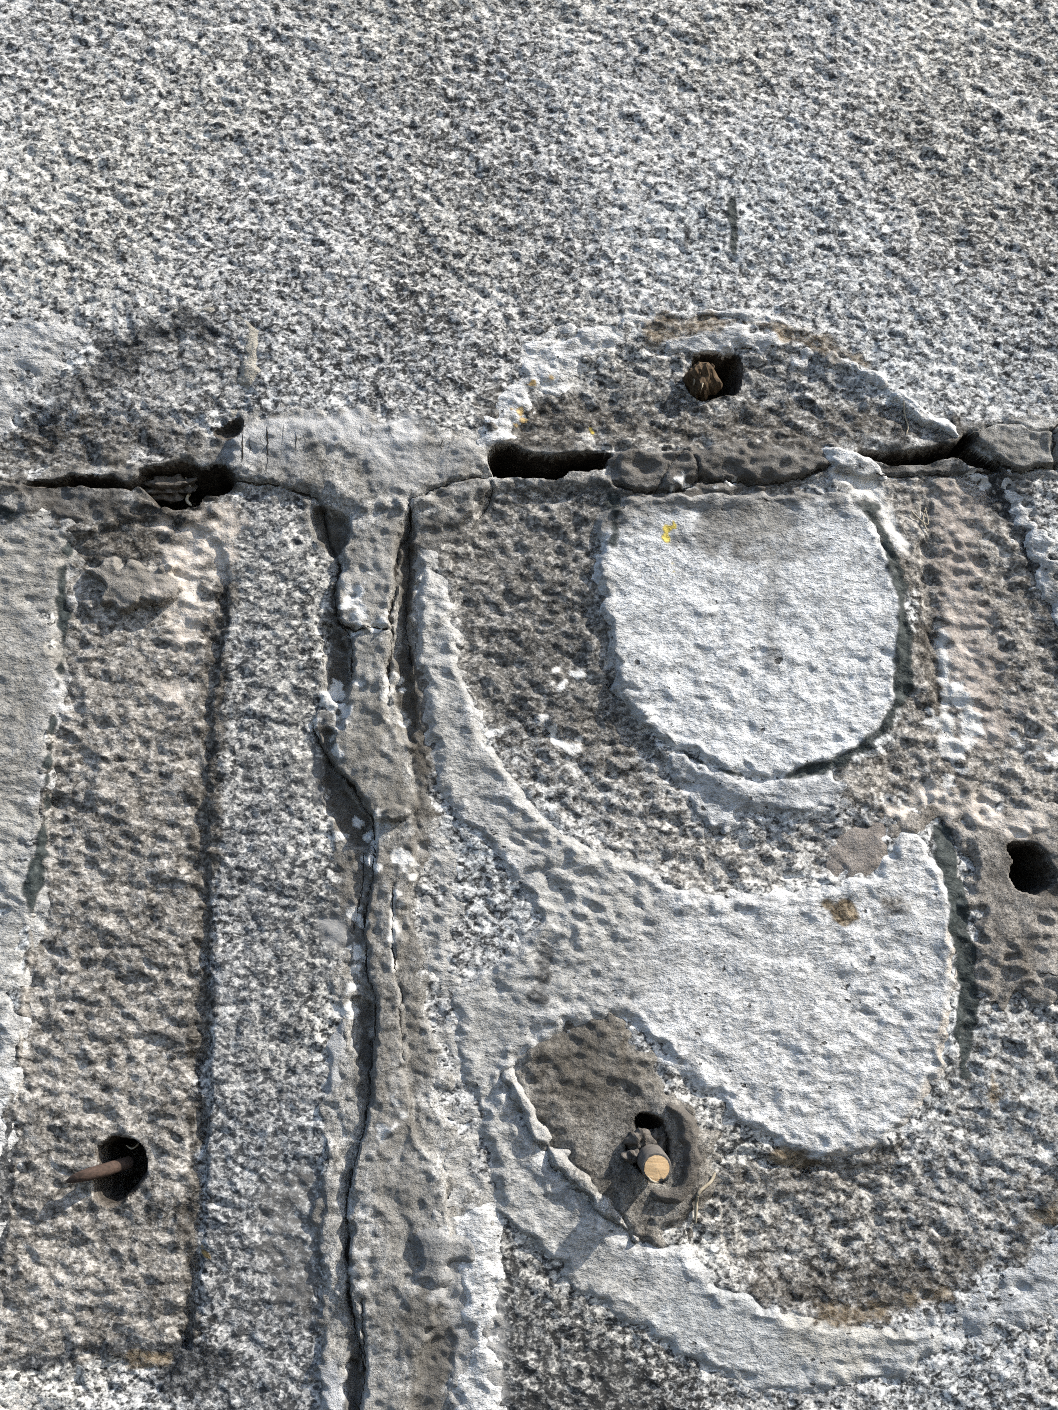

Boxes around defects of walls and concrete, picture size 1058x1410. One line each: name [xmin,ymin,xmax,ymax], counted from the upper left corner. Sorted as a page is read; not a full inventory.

crack [615,449,827,494]
crack [876,423,1058,478]
crack [237,476,493,705]
crack [312,726,404,1410]